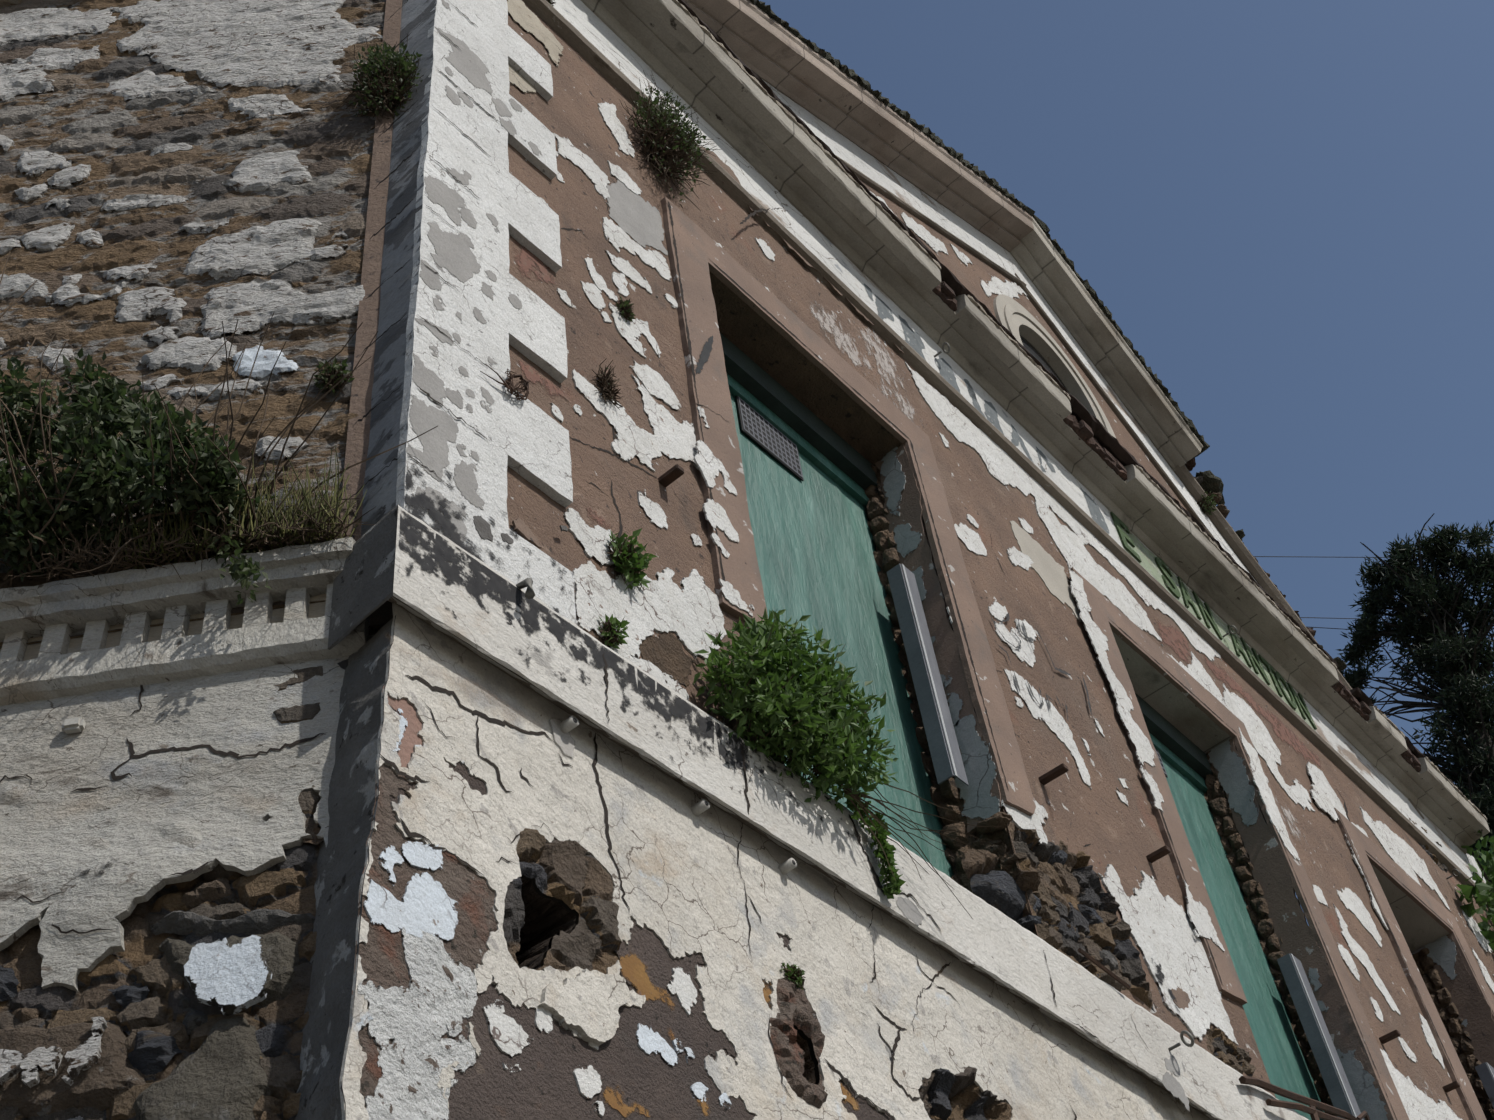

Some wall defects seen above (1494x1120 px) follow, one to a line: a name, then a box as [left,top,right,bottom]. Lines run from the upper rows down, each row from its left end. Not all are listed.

peeling [0,0,383,118]
peeling [0,218,365,402]
peeling [435,27,741,558]
crack [1,891,116,934]
crack [0,685,328,792]
crack [379,753,430,782]
crack [400,653,630,911]
peeling [352,686,755,1120]
leakage [398,453,799,806]
peeling [559,508,754,701]
crack [820,814,960,1120]
peeling [893,342,1494,1077]